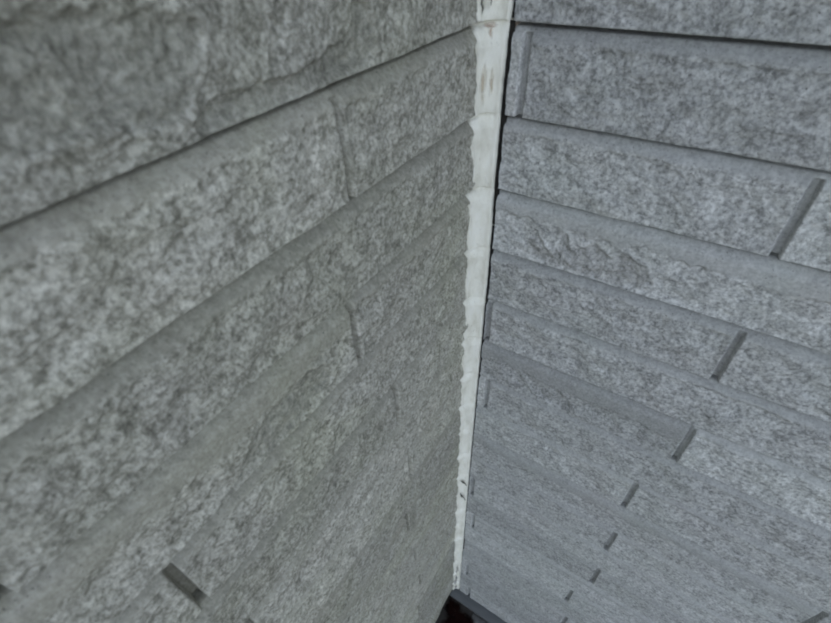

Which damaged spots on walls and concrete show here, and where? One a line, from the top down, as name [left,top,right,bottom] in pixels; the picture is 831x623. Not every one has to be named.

corrosion [442,598,474,623]